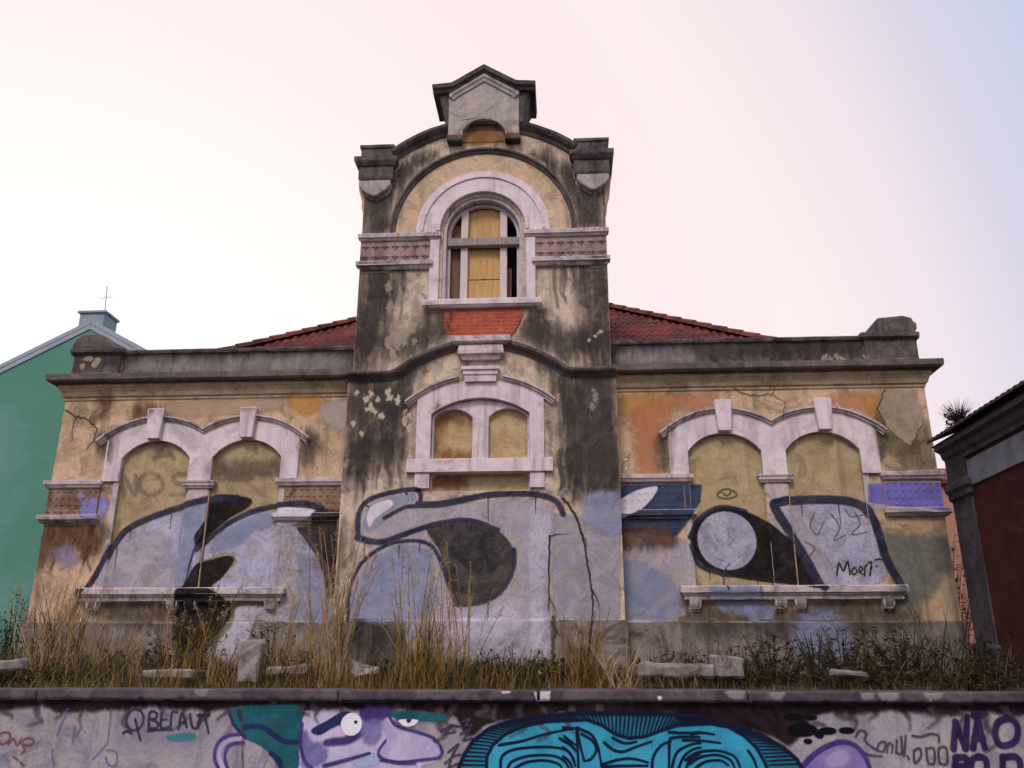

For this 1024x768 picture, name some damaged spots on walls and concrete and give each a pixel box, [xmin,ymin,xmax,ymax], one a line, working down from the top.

crack [65,407,100,450]
peeling [164,387,413,437]
damp [344,260,459,493]
damp [502,255,620,504]
crack [548,497,599,661]